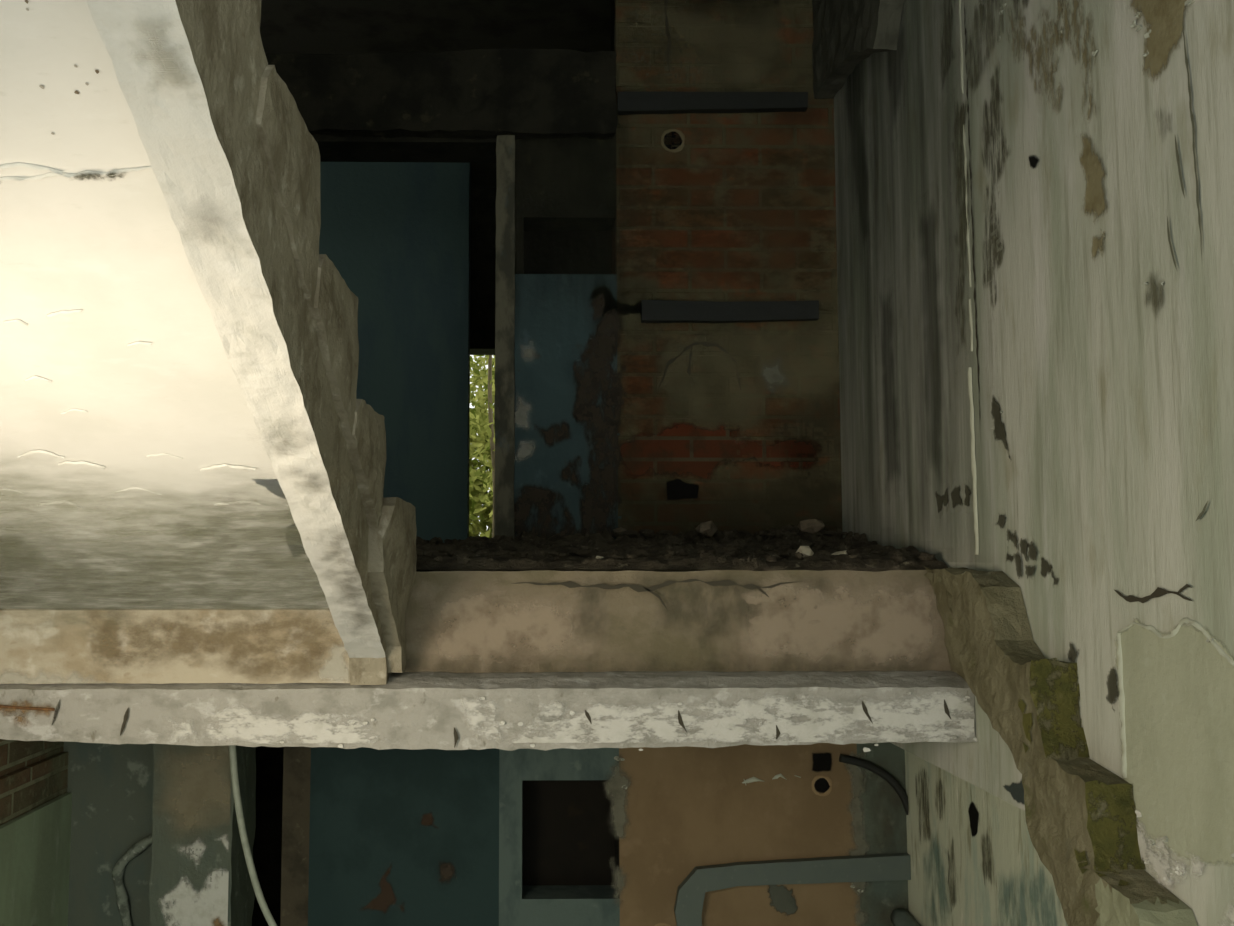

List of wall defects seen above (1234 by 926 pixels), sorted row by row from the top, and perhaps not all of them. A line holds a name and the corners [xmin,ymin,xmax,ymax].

flaking render [1130,0,1195,78]
crack [0,163,152,181]
peeling [968,0,1098,302]
flaking render [1080,137,1107,218]
flaking render [1092,233,1105,258]
leakage [0,492,324,675]
crack [1114,584,1192,603]
flaking render [1068,643,1078,663]
corrosion [0,701,55,723]
flaking render [1106,618,1234,886]
peeling [181,841,205,863]
peeling [161,870,229,926]